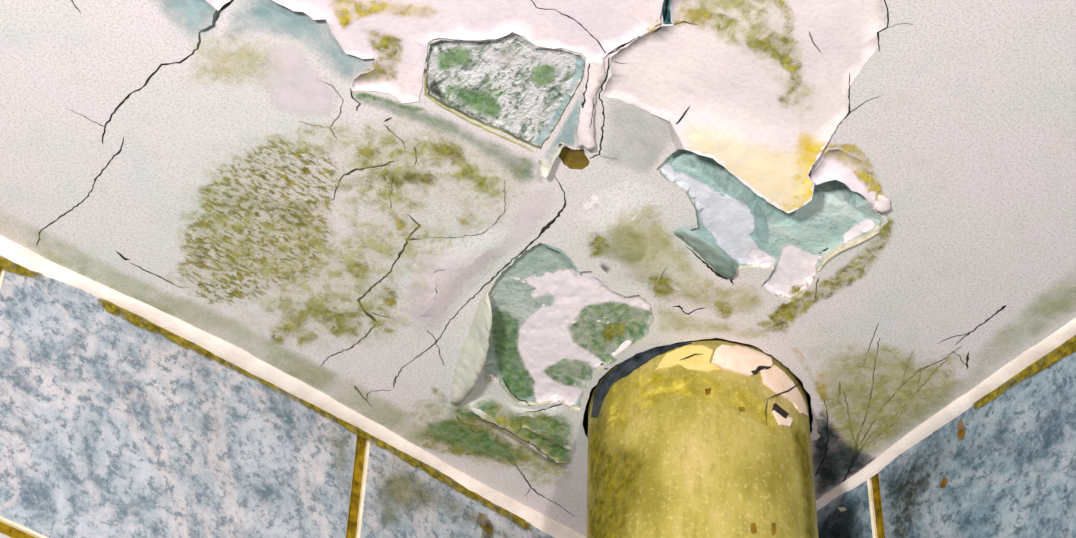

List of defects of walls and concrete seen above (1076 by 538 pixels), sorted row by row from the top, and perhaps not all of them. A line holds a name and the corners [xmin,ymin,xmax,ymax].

damp [0,256,42,277]
crack [36,0,233,245]
peeling [206,0,231,11]
damp [181,141,432,343]
damp [98,299,531,530]
crack [320,117,506,367]
crack [354,177,566,406]
flaking render [451,243,654,438]
peeling [272,0,892,301]
crack [531,0,698,160]
damp [796,364,952,538]
damp [973,335,1076,409]